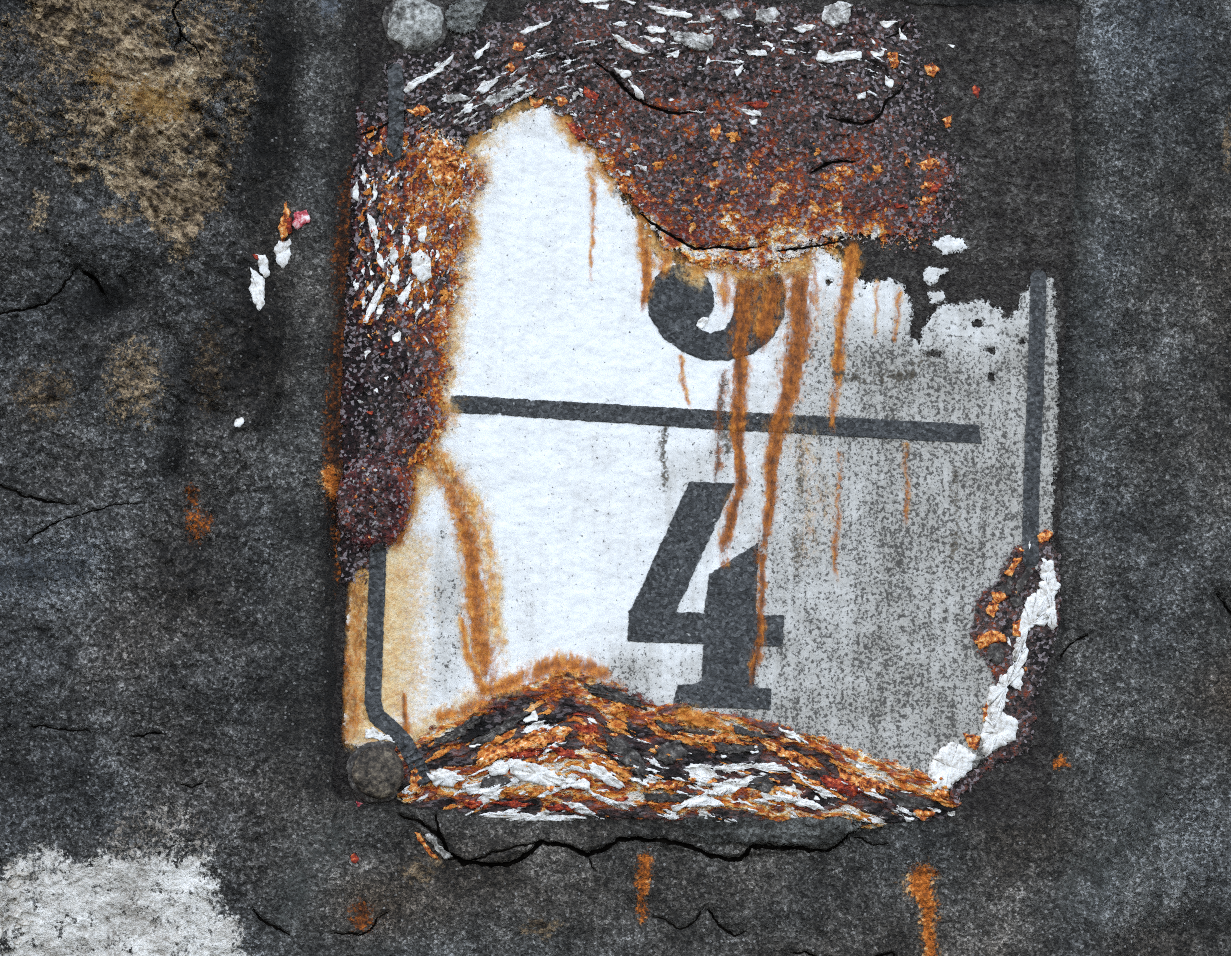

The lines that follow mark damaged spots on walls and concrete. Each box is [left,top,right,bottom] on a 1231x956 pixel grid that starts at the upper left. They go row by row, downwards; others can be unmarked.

corrosion [321,0,973,829]
crack [0,484,138,544]
peeling [926,529,1062,804]
crack [400,815,888,870]
corrosion [634,853,654,923]
corrosion [903,864,940,956]